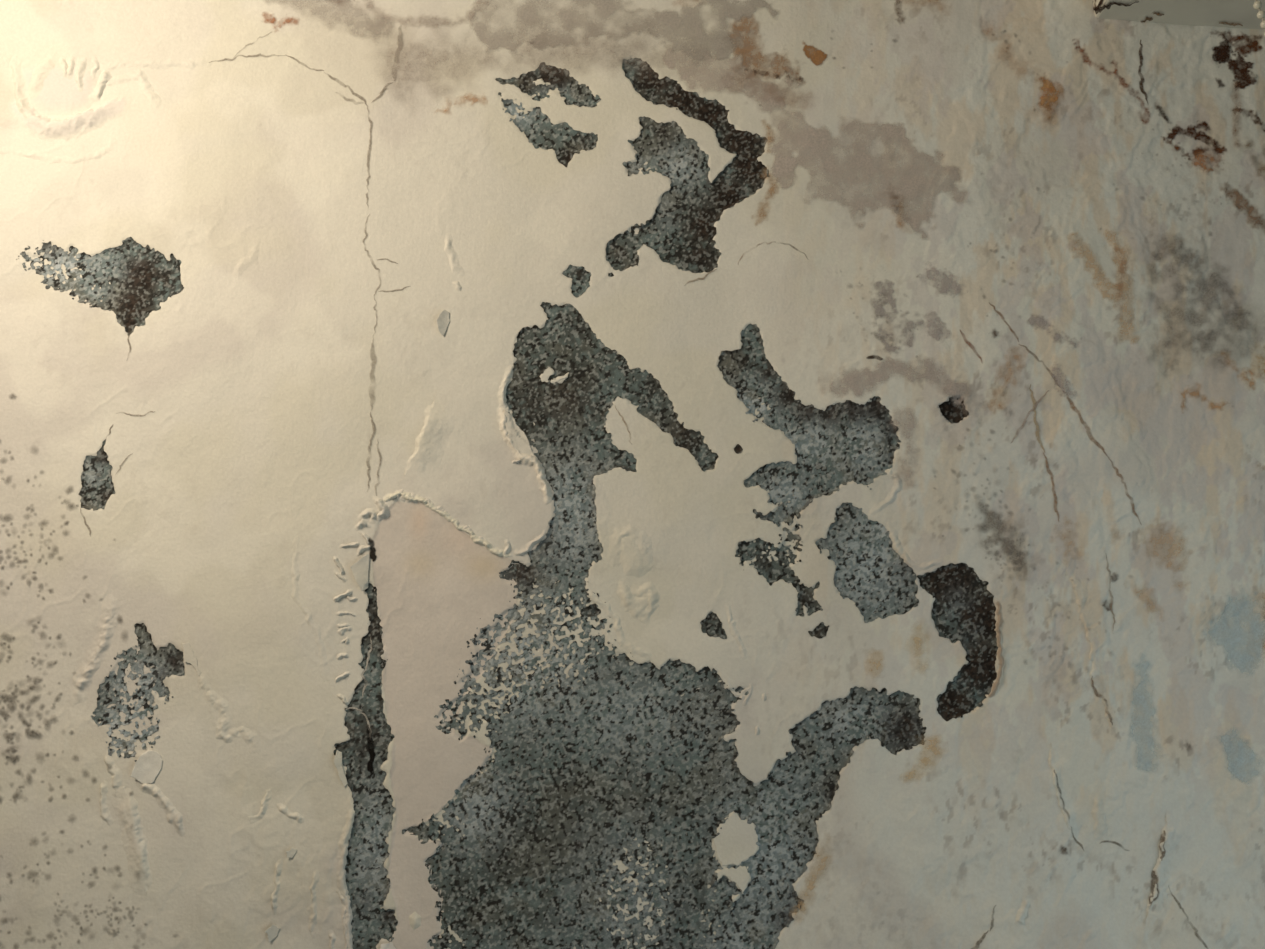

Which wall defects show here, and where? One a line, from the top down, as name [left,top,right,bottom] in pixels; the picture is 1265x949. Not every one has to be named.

spalling [18,237,184,336]
crack [209,36,409,330]
spalling [495,62,601,167]
spalling [605,58,770,277]
leakage [469,0,965,238]
rust [729,17,802,81]
rust [803,43,827,65]
crack [367,412,381,496]
spalling [333,264,926,949]
spalling [717,324,1005,721]
crack [989,303,1142,525]
crack [1091,678,1113,725]